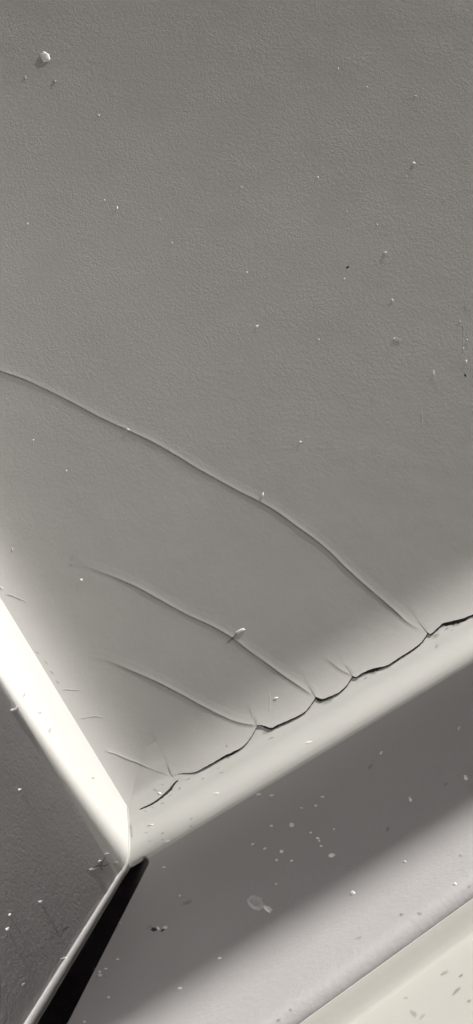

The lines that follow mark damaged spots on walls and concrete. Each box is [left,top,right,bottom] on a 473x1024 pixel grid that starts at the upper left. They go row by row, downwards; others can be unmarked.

crack [0,361,473,810]